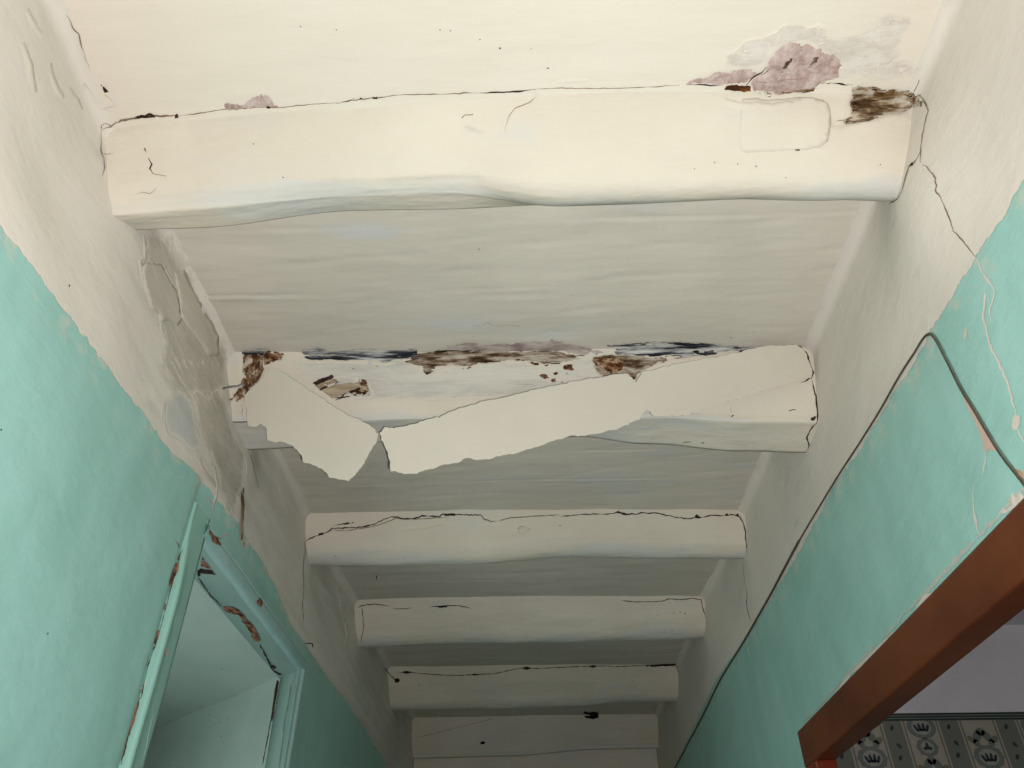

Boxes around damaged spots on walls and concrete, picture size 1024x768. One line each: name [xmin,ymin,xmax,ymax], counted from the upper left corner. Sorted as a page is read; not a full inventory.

peeling [687,15,928,124]
crack [100,78,676,176]
crack [890,81,1024,442]
peeling [139,230,244,546]
leakage [242,348,268,356]
leakage [295,347,417,363]
flaking render [244,344,812,481]
peeling [963,397,998,453]
crack [302,511,751,620]
crack [385,664,679,683]